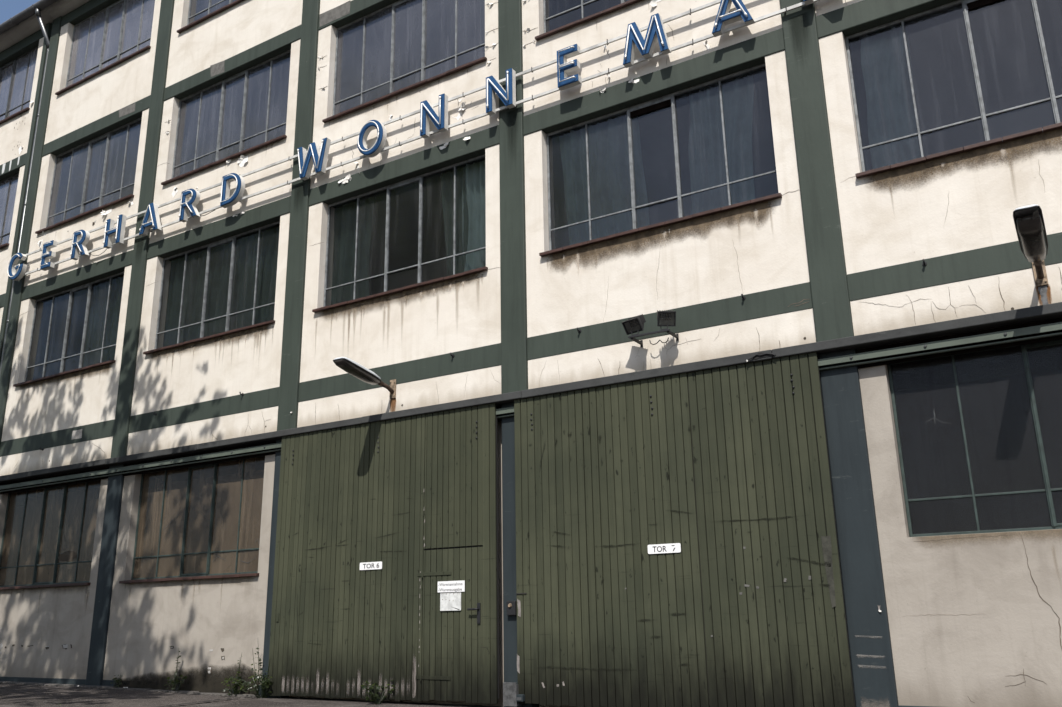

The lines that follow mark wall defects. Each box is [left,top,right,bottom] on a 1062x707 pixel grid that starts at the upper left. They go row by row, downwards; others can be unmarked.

damp [868,128,1062,189]
damp [550,200,772,269]
damp [322,272,480,317]
crack [866,287,1005,324]
crack [922,534,1062,649]
damp [116,665,258,694]